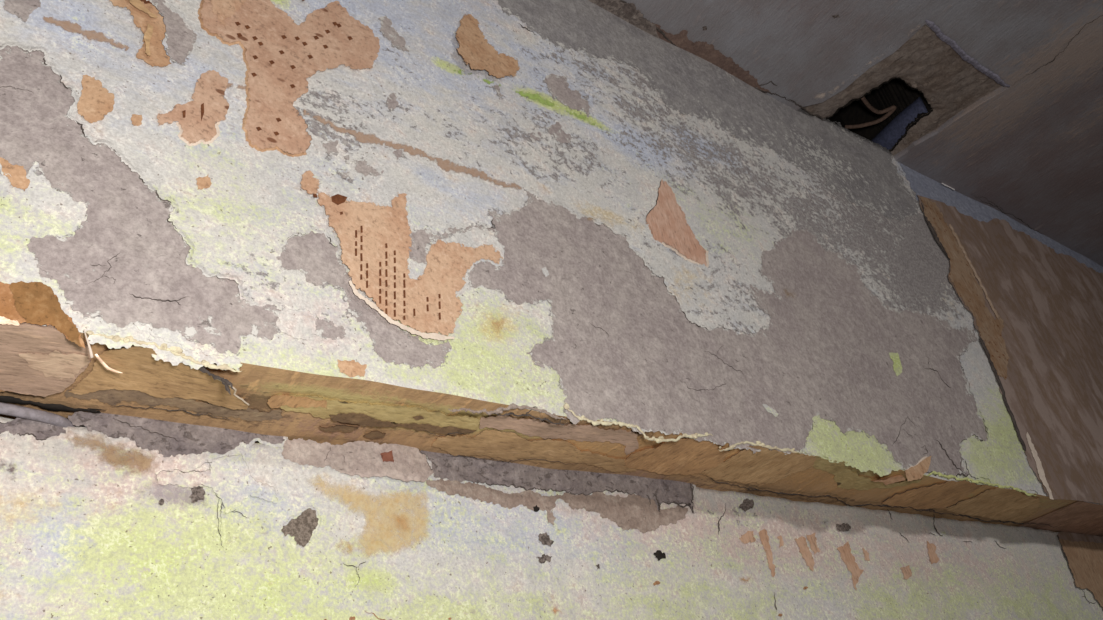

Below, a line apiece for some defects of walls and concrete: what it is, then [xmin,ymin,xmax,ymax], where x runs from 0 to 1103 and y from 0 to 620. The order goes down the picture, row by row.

flaking render [3,0,44,24]
peeling [109,0,409,176]
peeling [456,14,520,101]
spalling [589,0,770,92]
spalling [803,19,1010,156]
flaking render [0,41,282,371]
flaking render [275,170,1038,493]
crack [216,495,249,547]
flaking render [0,411,696,563]
water stain [315,480,427,555]
crack [427,431,582,464]
crack [494,406,567,425]